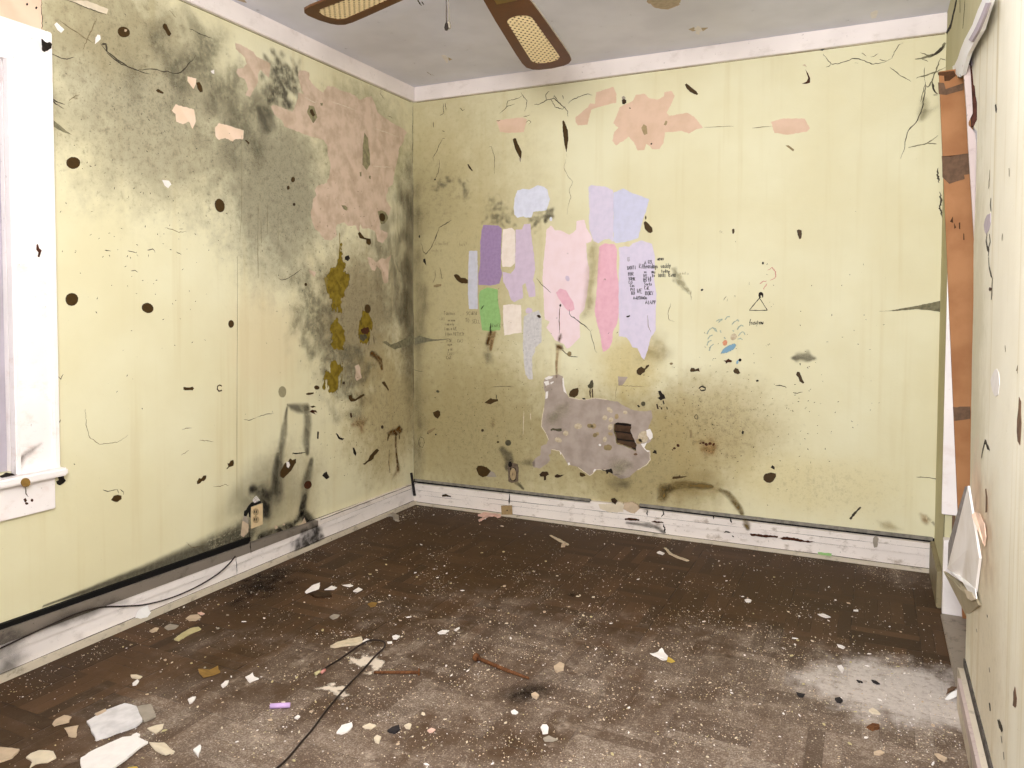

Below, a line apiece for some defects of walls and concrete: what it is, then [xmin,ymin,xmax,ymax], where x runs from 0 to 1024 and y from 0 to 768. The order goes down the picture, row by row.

crack [102,10,210,74]
peeling [235,43,271,97]
leakage [258,59,298,126]
peeling [271,70,407,243]
crack [499,91,587,124]
peeling [575,87,703,150]
peeling [771,118,810,135]
crack [821,44,926,156]
peeling [367,255,391,283]
spalling [532,374,653,479]
leakage [659,482,750,530]